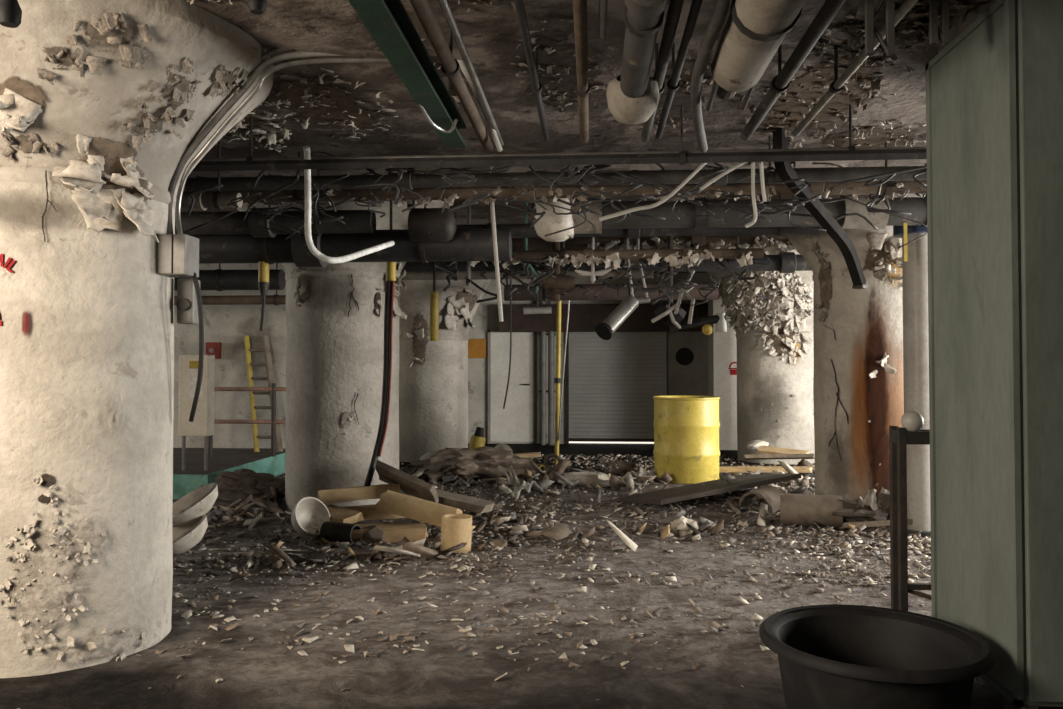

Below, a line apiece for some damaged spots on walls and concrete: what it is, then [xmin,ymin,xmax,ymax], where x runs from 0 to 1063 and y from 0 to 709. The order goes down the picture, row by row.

peeling [0,12,249,243]
peeling [225,68,398,152]
peeling [736,0,963,149]
peeling [712,242,832,365]
corrosion [853,290,904,492]
spalling [0,474,147,666]